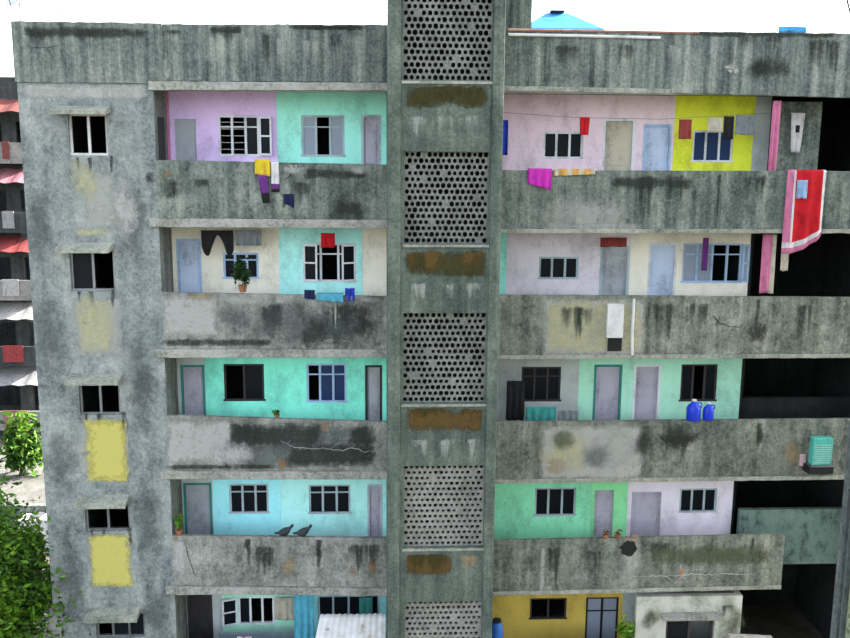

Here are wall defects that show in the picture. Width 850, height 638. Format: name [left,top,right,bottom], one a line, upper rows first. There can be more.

corrosion [407,85,487,110]
corrosion [406,251,484,280]
water stain [263,298,374,345]
corrosion [408,408,482,431]
water stain [244,539,273,567]
water stain [351,545,377,567]
corrosion [406,554,451,575]